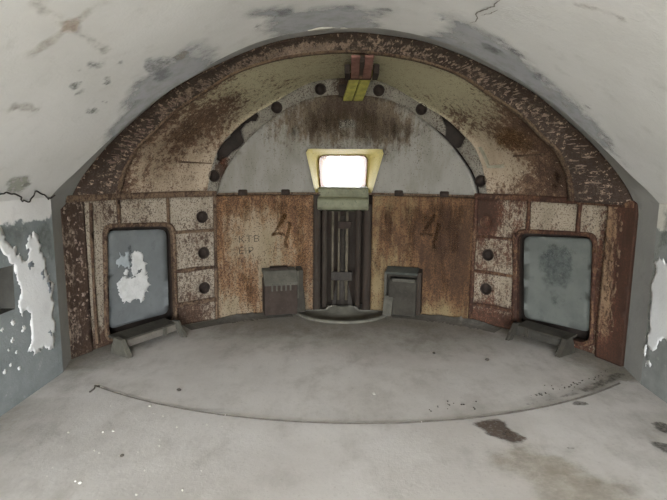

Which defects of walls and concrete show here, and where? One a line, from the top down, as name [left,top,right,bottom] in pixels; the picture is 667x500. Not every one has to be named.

crack [471,0,500,23]
peeling [0,226,56,355]
peeling [116,251,151,303]
peeling [643,257,667,367]
leakage [475,419,526,442]